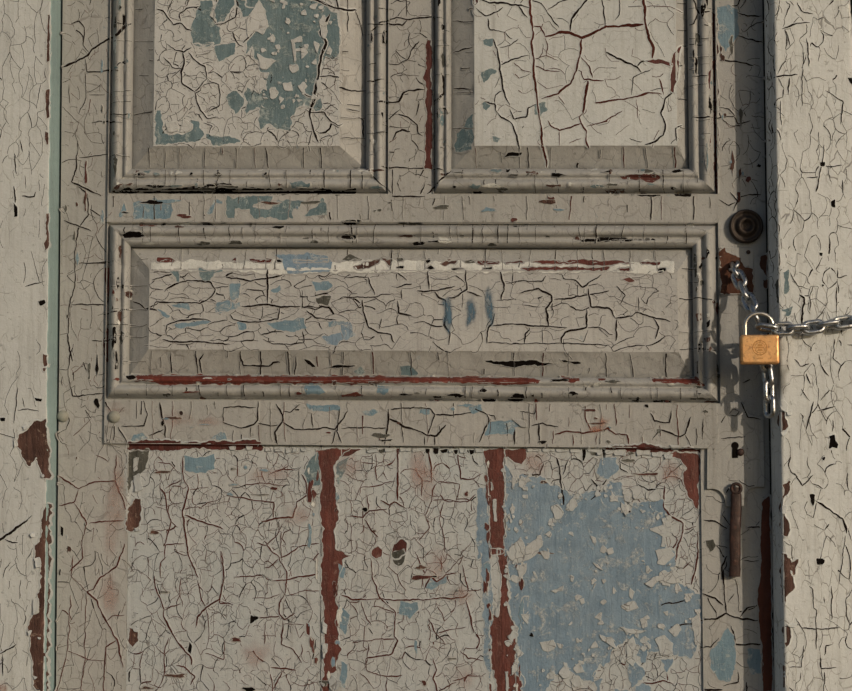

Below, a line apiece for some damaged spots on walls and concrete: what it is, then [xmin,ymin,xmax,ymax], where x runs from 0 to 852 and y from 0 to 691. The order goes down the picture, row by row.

crack [0,0,48,217]
peeling [189,0,342,133]
crack [0,339,42,691]
peeling [13,417,54,480]
peeling [26,502,62,691]
peeling [86,276,581,416]
crack [54,0,718,691]
peeling [123,407,704,691]
crack [503,387,761,648]
crack [551,638,749,691]
peeling [708,479,800,691]
crack [679,0,852,691]